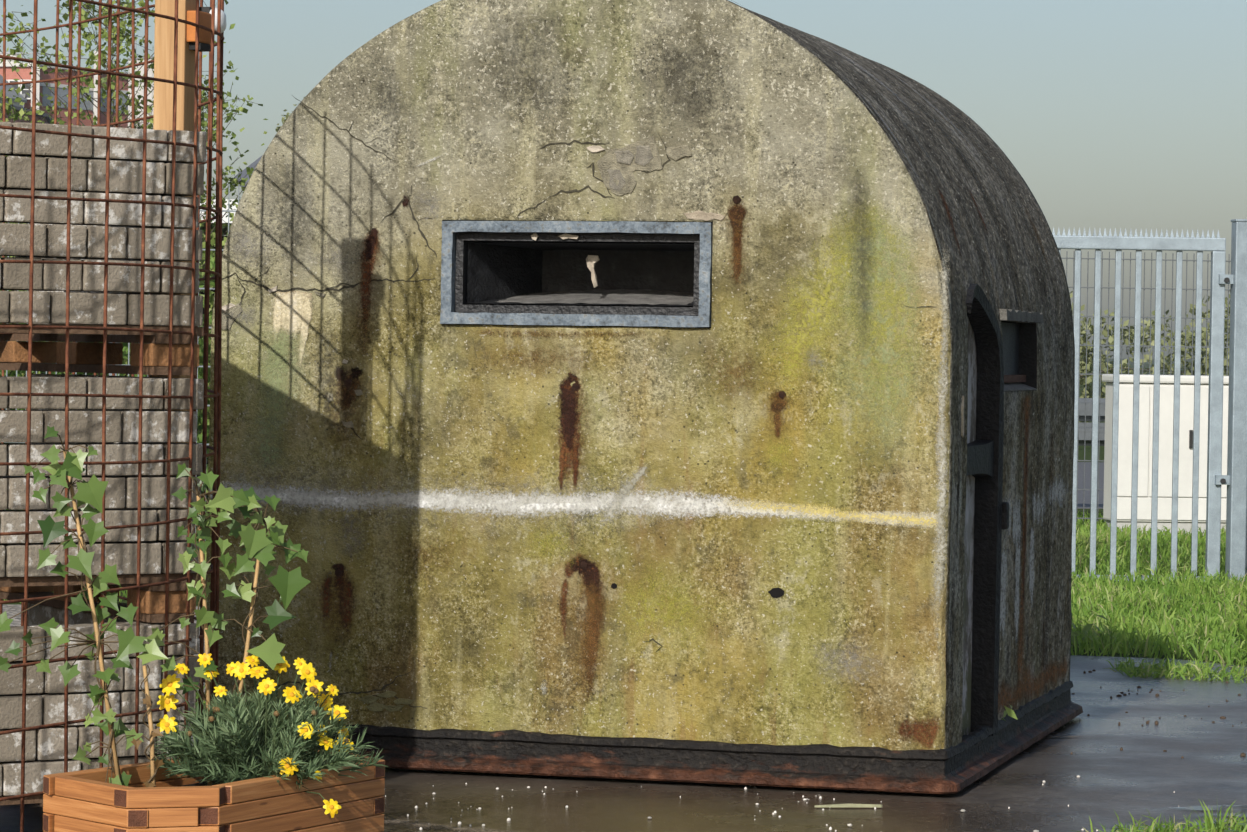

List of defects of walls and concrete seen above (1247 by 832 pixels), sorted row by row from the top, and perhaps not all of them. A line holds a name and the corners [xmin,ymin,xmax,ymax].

crack [294,97,392,160]
spalling [516,133,693,218]
crack [211,185,437,305]
corrosion [359,201,403,351]
corrosion [728,195,746,279]
corrosion [327,359,363,440]
corrosion [558,373,584,488]
corrosion [771,391,787,437]
corrosion [1018,396,1031,673]
corrosion [322,563,354,638]
corrosion [560,554,604,697]
corrosion [899,719,939,749]